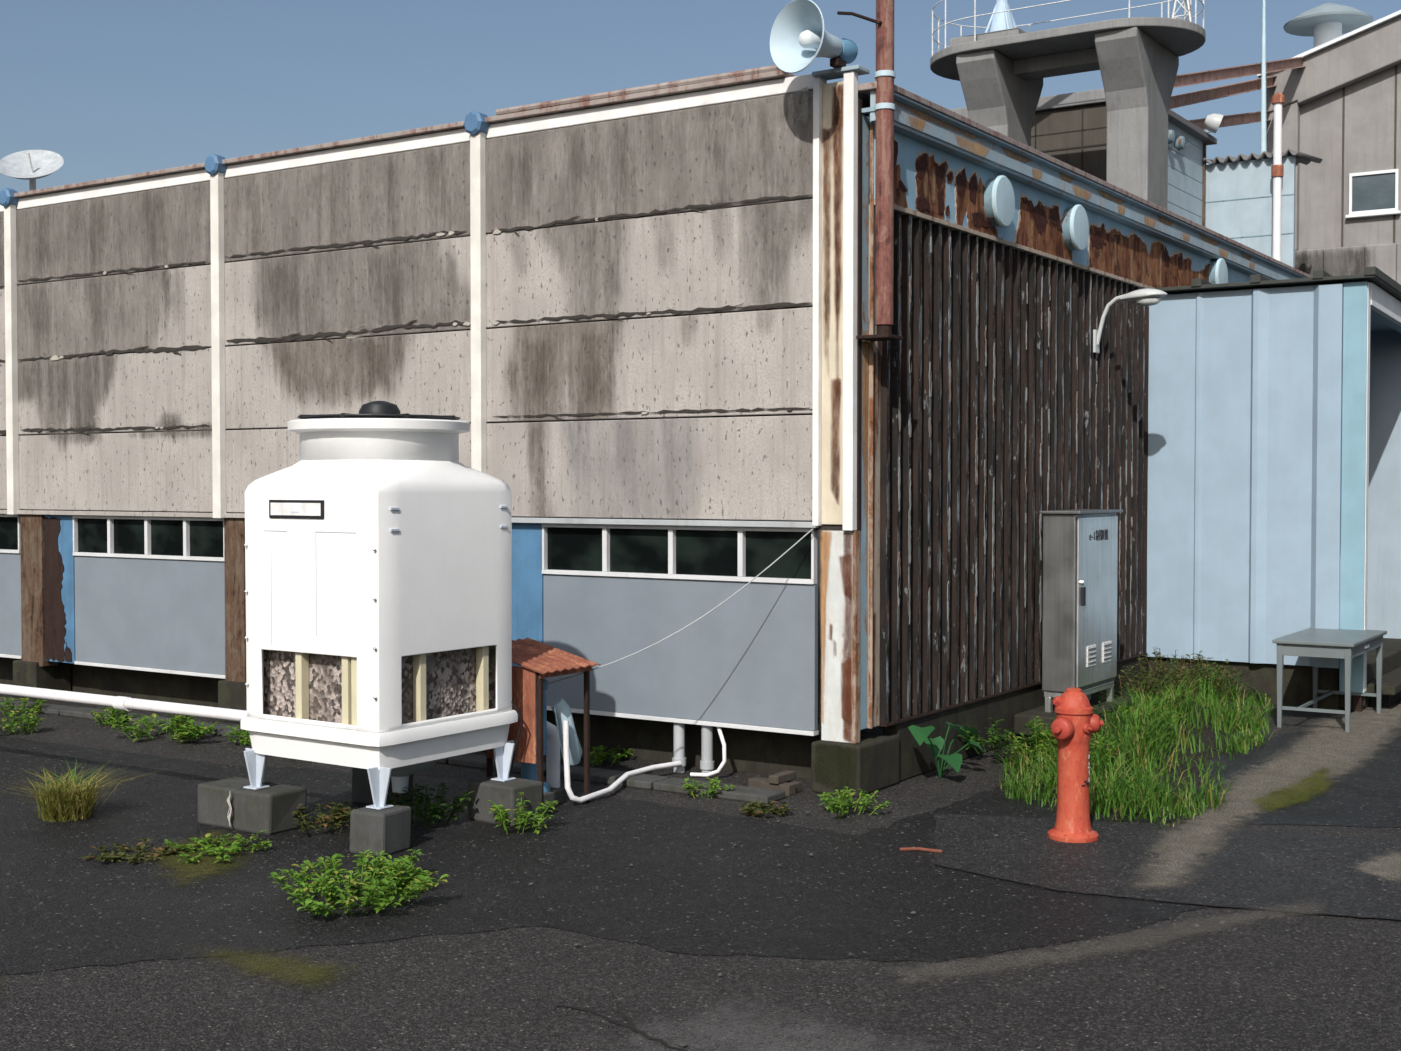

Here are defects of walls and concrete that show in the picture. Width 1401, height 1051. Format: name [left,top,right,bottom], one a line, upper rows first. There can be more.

leakage [0,183,227,286]
leakage [254,212,467,397]
rust [823,85,844,340]
rust [894,103,1255,288]
leakage [18,355,110,441]
leakage [161,416,212,437]
rust [831,379,841,501]
rust [862,331,881,546]
rust [821,532,852,742]
crack [616,1002,688,1051]